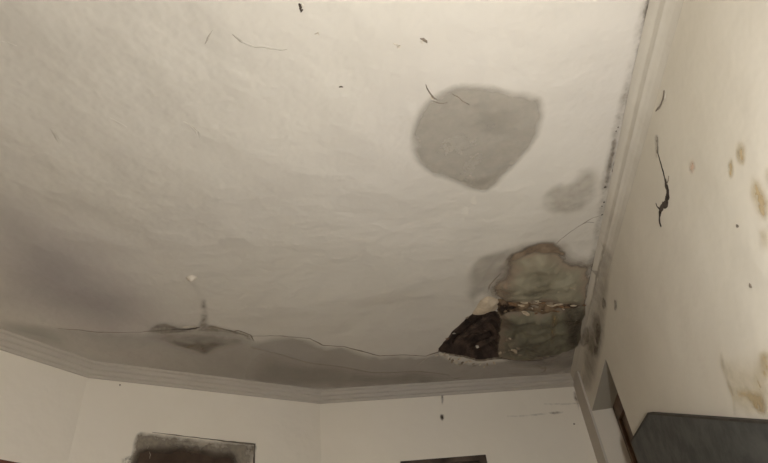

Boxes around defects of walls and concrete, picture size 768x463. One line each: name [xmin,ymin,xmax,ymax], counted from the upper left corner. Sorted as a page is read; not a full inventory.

leakage [415,89,539,190]
crack [656,137,670,227]
leakage [157,319,402,373]
spalling [438,296,586,362]